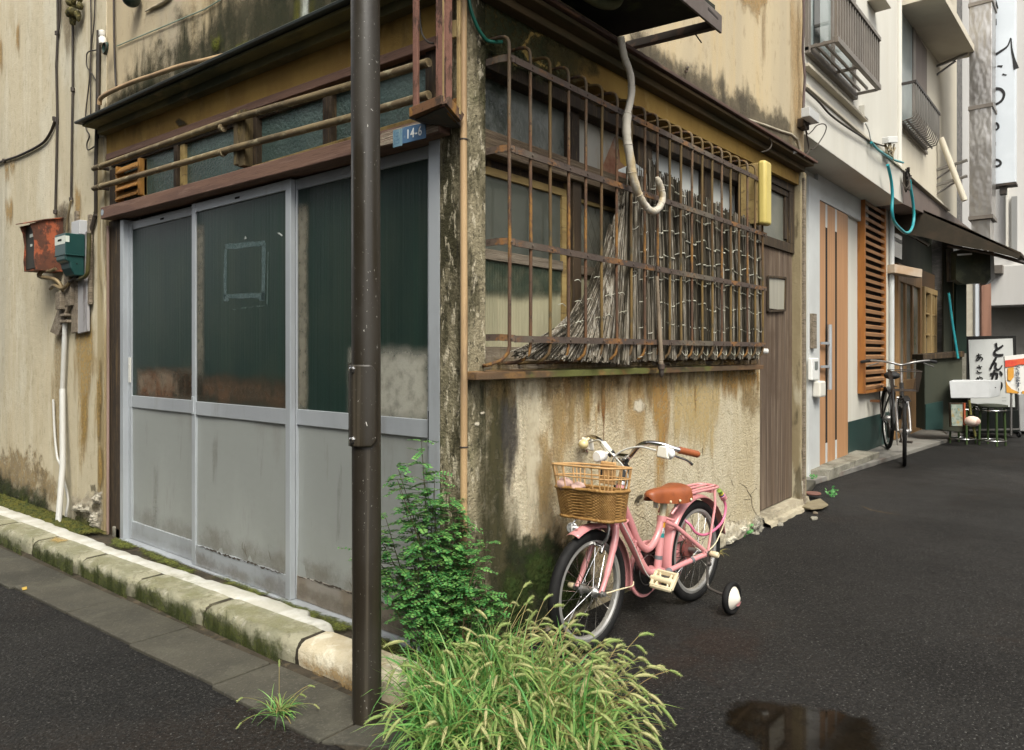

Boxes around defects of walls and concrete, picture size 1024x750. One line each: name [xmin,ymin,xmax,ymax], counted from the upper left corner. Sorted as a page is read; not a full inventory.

leakage [111,0,337,104]
leakage [631,8,803,149]
leakage [0,449,57,502]
leakage [74,329,97,446]
leakage [479,364,519,645]
rust [587,375,640,420]
leakage [640,360,759,487]